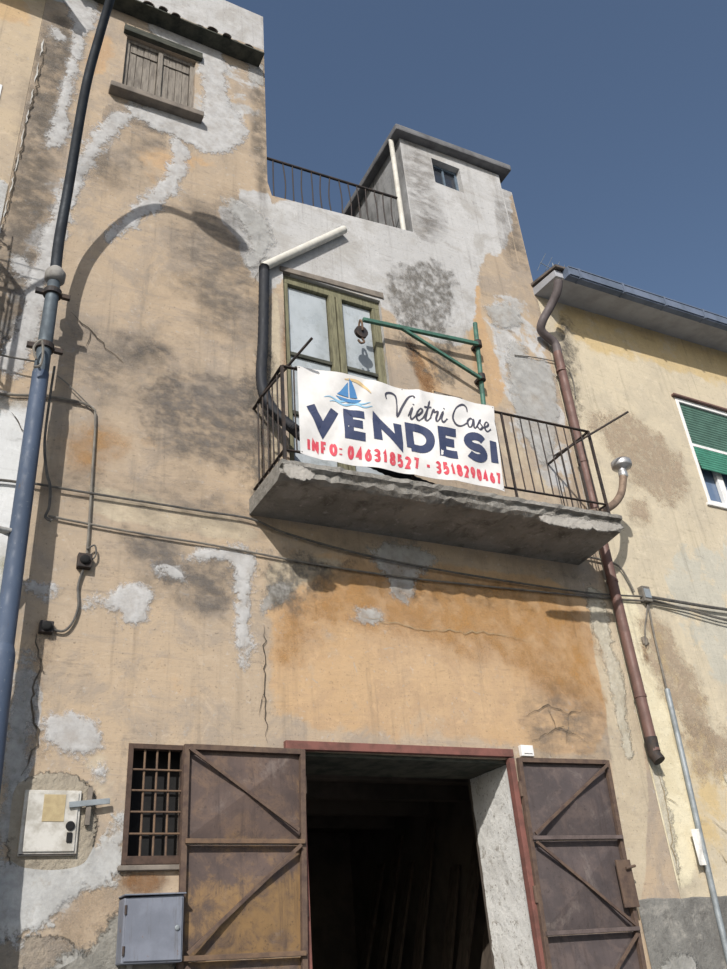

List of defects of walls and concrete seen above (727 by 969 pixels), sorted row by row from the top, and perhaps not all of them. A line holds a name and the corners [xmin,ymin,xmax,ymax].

crack [0,39,47,233]
peeling [104,138,191,243]
water stain [389,262,459,382]
water stain [145,377,276,485]
crack [259,629,268,743]
crack [528,704,587,743]
flaking render [0,934,74,969]
peeling [660,952,698,969]